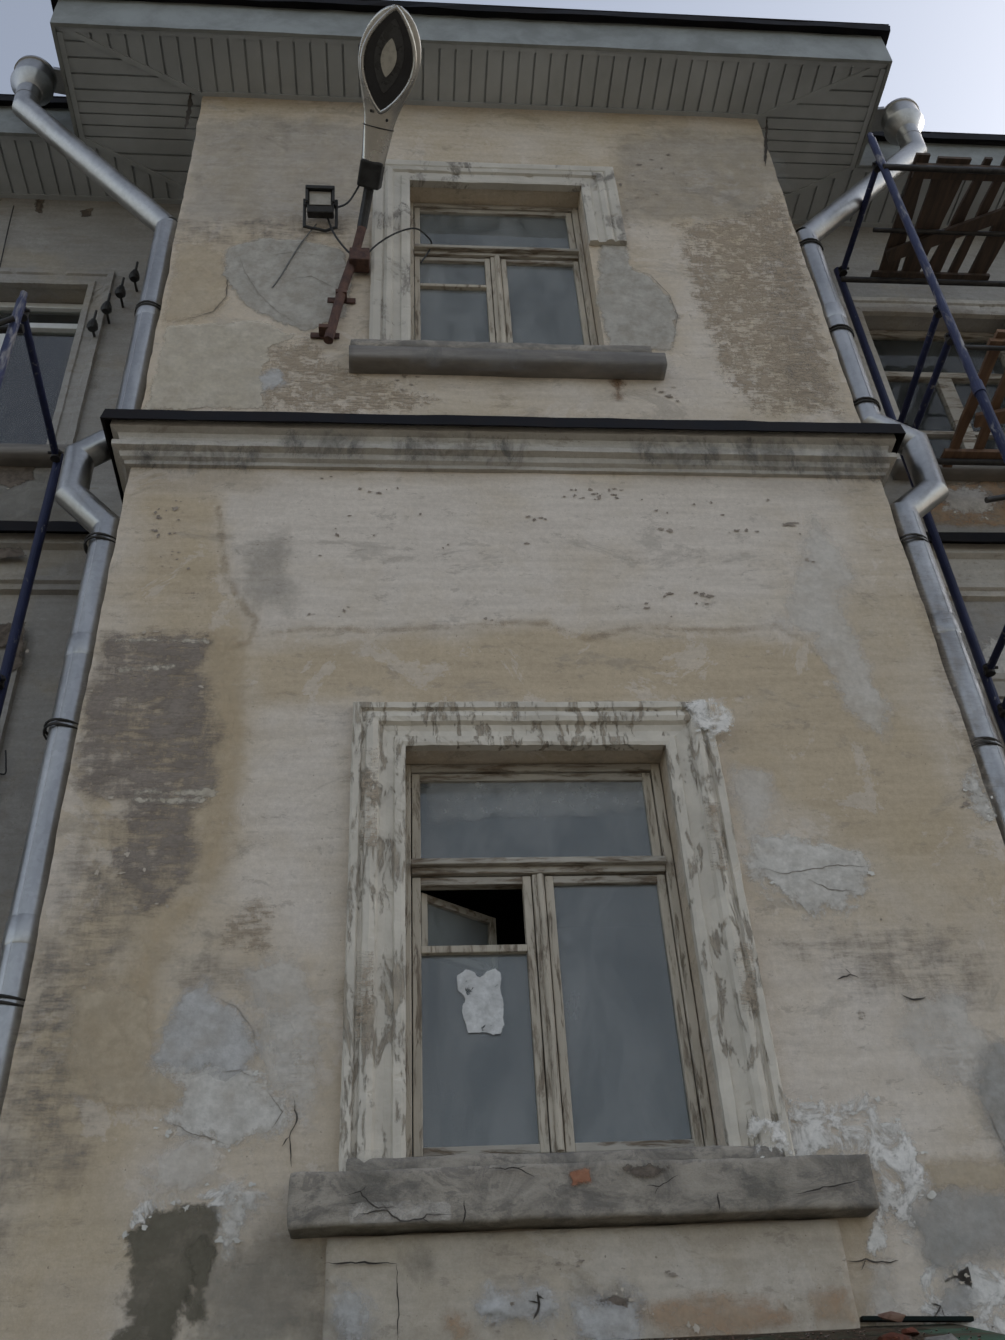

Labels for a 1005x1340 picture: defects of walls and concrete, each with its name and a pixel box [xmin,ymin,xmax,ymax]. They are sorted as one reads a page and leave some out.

spalling [597,245,679,350]
spalling [746,834,875,917]
spalling [152,1059,288,1152]
spalling [747,1115,792,1158]
spalling [122,1181,265,1255]
crack [797,1180,861,1194]
water stain [111,1204,220,1340]